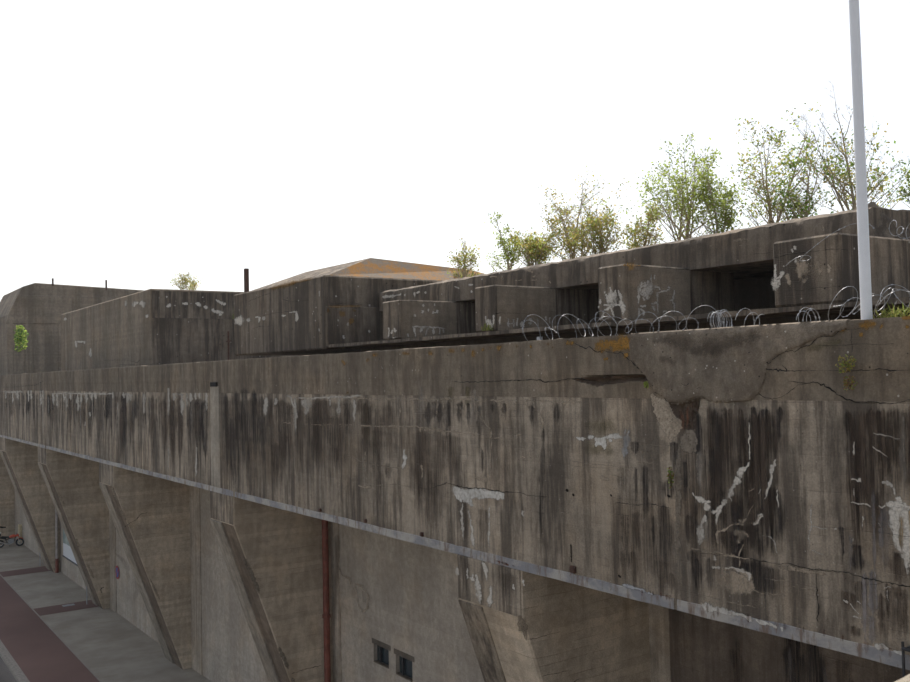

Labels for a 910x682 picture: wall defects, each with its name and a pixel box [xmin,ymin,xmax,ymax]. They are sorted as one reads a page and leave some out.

crack [759,327,910,404]
leakage [3,388,208,476]
leakage [224,388,521,548]
crack [419,482,543,497]
leakage [576,433,638,453]
spalling [650,393,700,453]
leakage [808,408,910,638]
efflorescence [455,562,493,607]